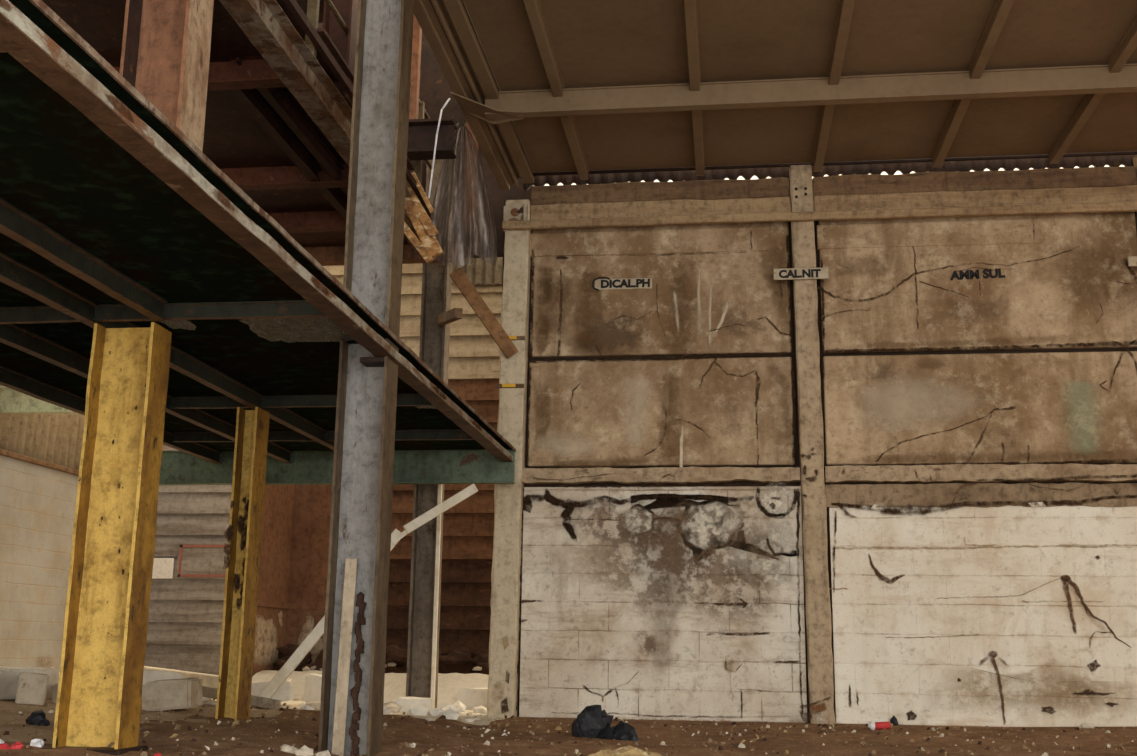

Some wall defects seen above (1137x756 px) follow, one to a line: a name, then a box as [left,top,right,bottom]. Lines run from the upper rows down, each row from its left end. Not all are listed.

crack [819,230,1071,329]
crack [523,411,752,538]
crack [876,407,1137,503]
peeling [626,509,651,532]
leakage [589,505,740,604]
peeling [684,503,739,548]
crack [837,544,1137,583]
leakage [644,635,655,652]
crack [991,575,1131,647]